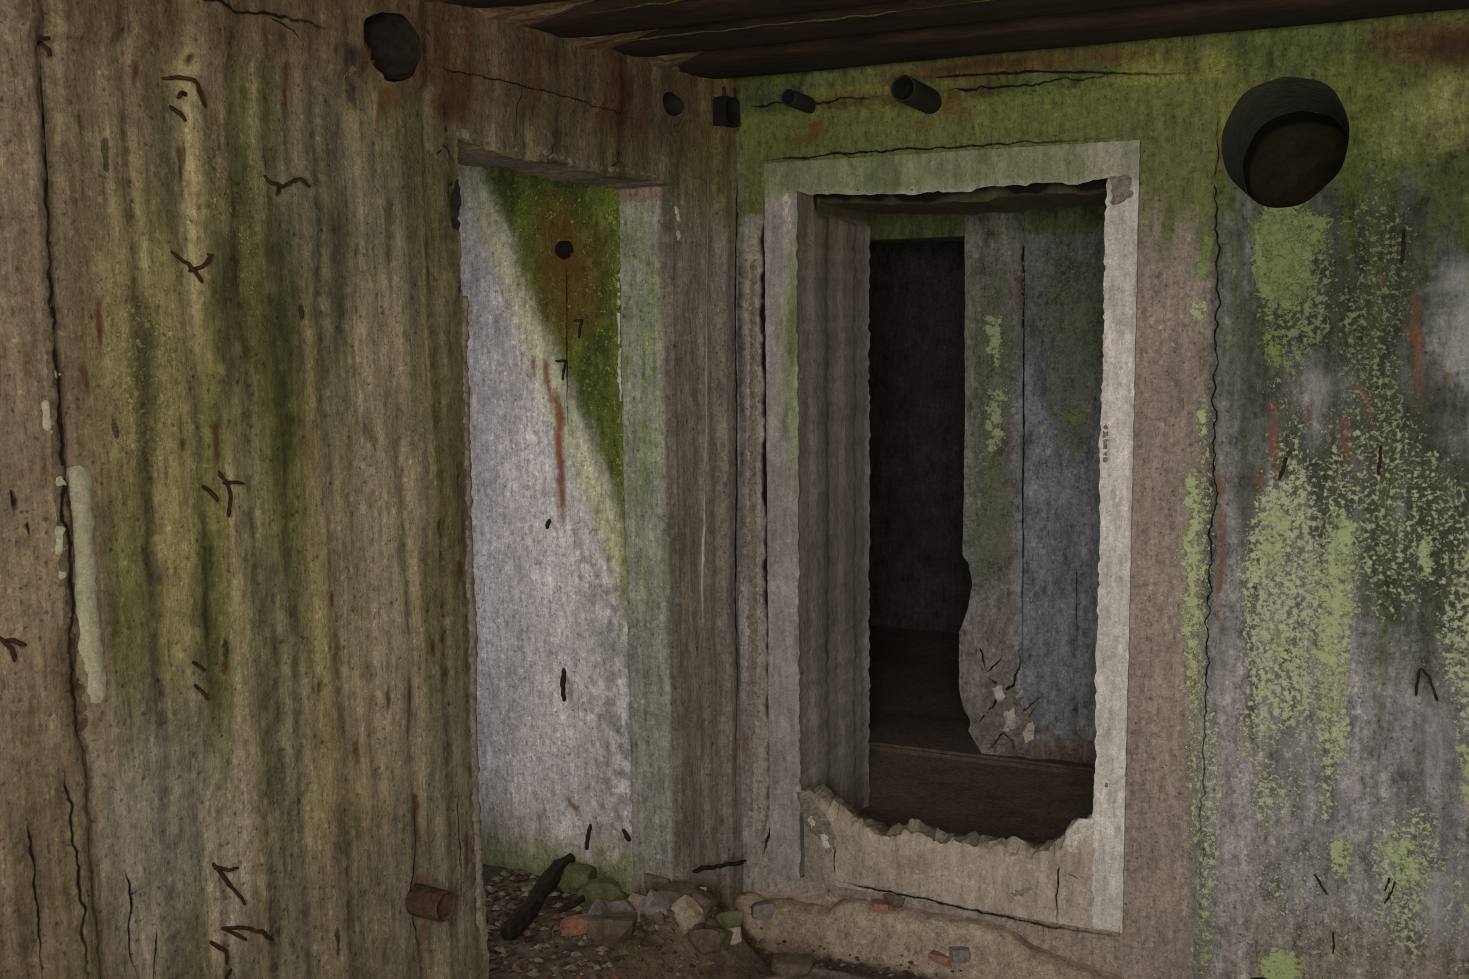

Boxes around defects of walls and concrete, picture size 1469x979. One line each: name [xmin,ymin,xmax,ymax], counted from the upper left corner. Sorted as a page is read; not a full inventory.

crack [205,0,319,36]
crack [438,66,638,134]
crack [753,97,868,108]
crack [937,70,1155,92]
crack [767,140,1077,161]
rust [532,359,564,507]
crack [10,12,87,966]
crack [1199,124,1221,821]
spalling [980,661,1038,753]
spalling [796,790,837,855]
spalling [1063,818,1095,852]
crack [126,876,157,979]